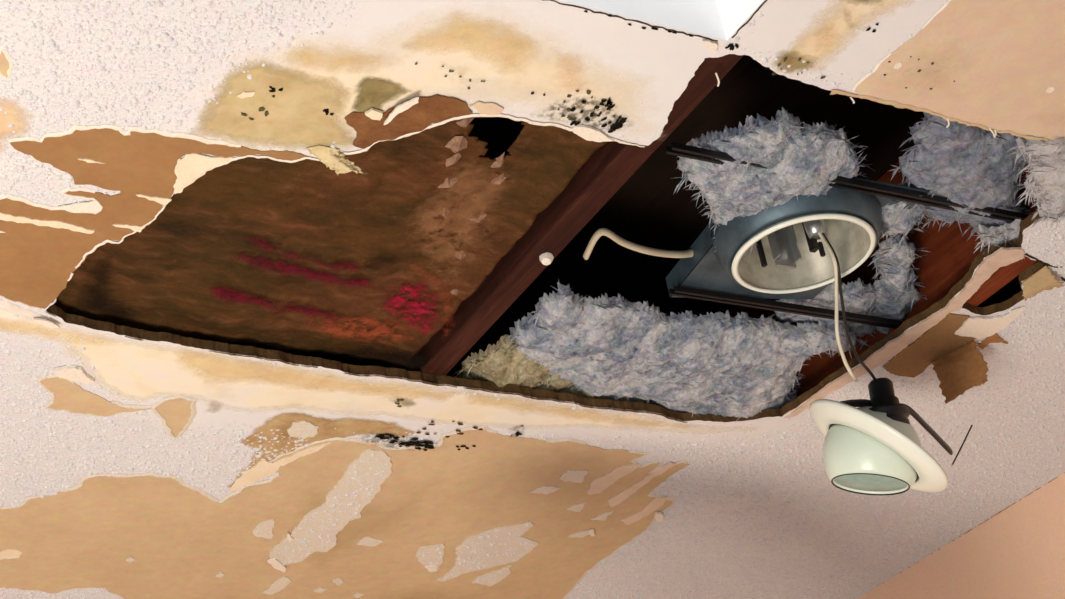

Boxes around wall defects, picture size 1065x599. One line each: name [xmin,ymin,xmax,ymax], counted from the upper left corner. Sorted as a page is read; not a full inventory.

damp [199,20,633,147]
peeling [345,94,504,148]
peeling [573,124,614,142]
damp [777,0,905,79]
peeling [851,0,1065,142]
peeling [0,124,309,328]
damp [239,242,369,286]
damp [213,288,398,336]
damp [386,286,435,332]
spalling [785,247,1025,418]
damp [229,413,483,492]
peeling [0,426,690,599]